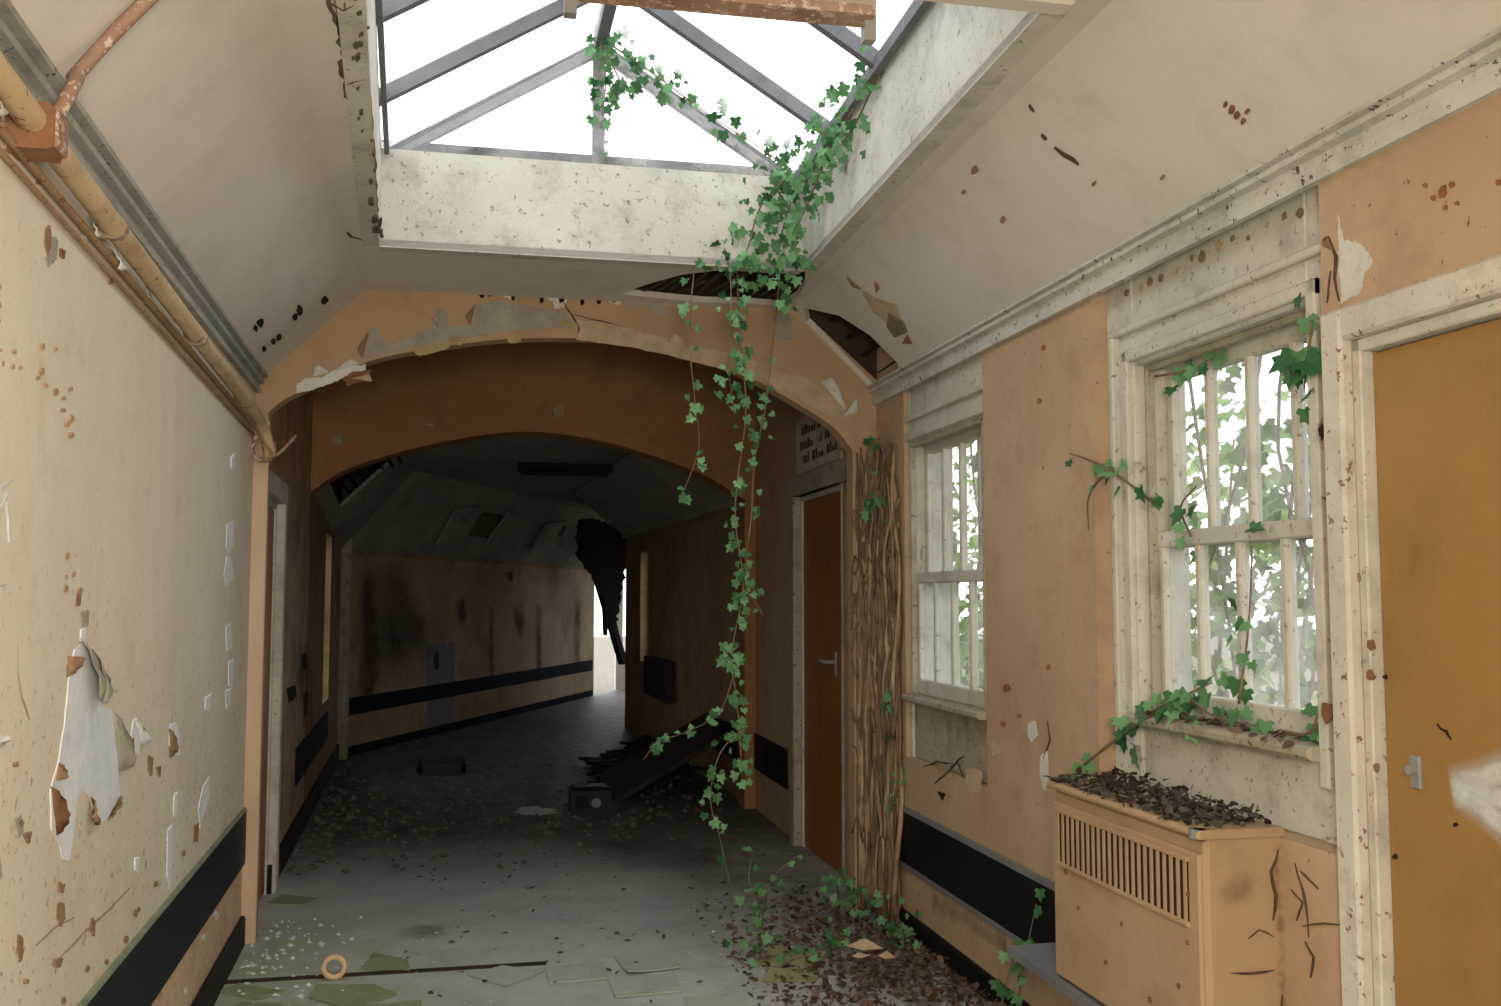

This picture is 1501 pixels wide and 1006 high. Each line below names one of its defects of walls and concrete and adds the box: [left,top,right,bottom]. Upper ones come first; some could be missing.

peeling [1321,215,1373,304]
peeling [847,277,912,344]
peeling [296,295,858,421]
peeling [50,593,180,860]
peeling [12,814,32,844]
peeling [134,776,210,892]
peeling [56,881,66,927]
peeling [16,934,29,984]